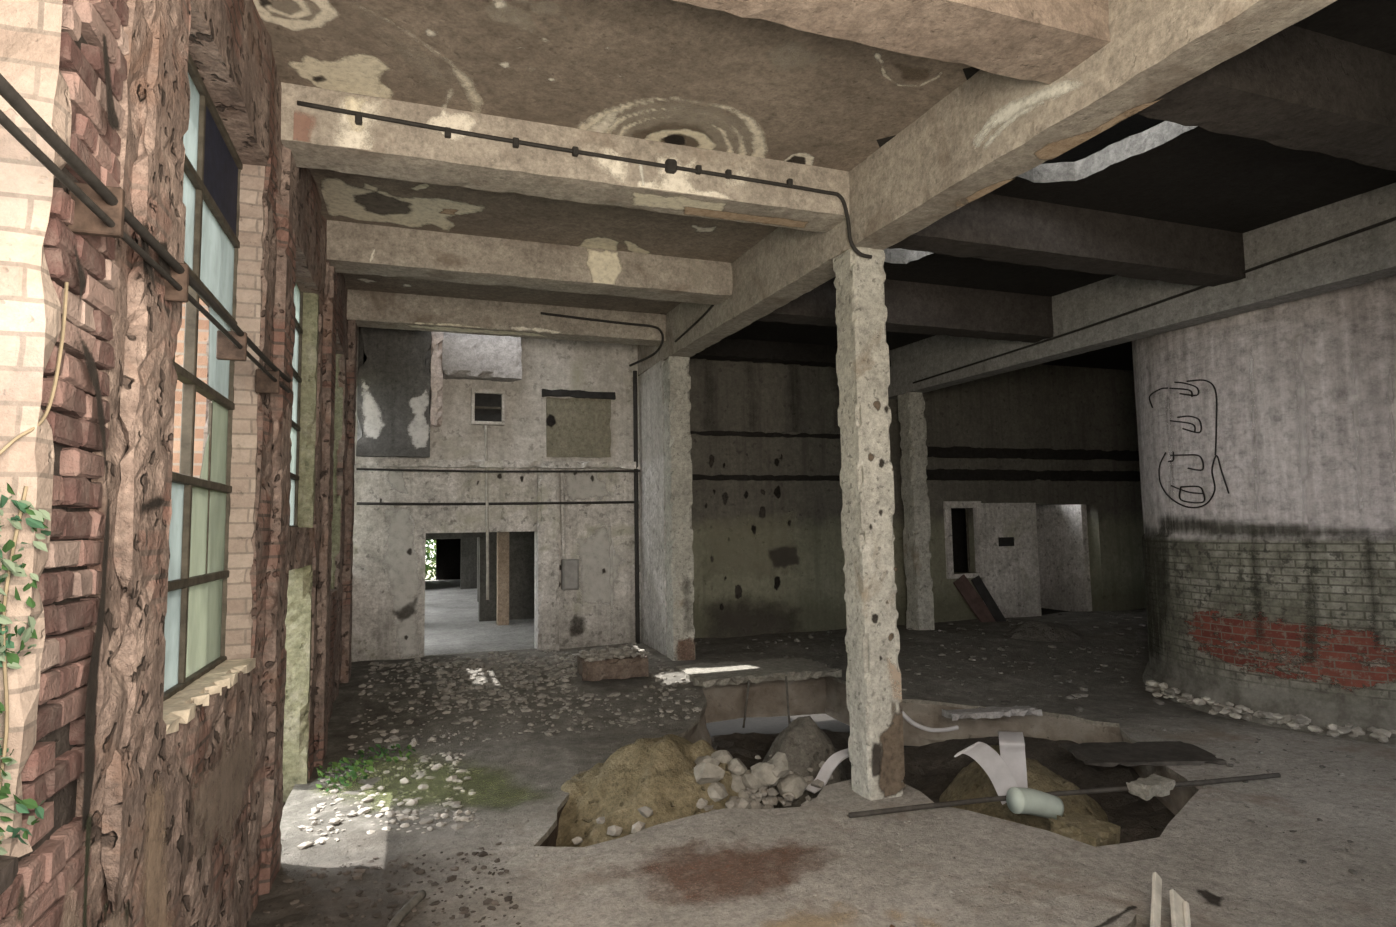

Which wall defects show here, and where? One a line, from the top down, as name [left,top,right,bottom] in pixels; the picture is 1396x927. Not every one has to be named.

peeling [253,0,338,31]
peeling [321,178,485,230]
spalling [633,181,808,232]
peeling [578,237,650,284]
peeling [362,383,384,439]
peeling [408,390,429,448]
damp [1142,480,1377,661]